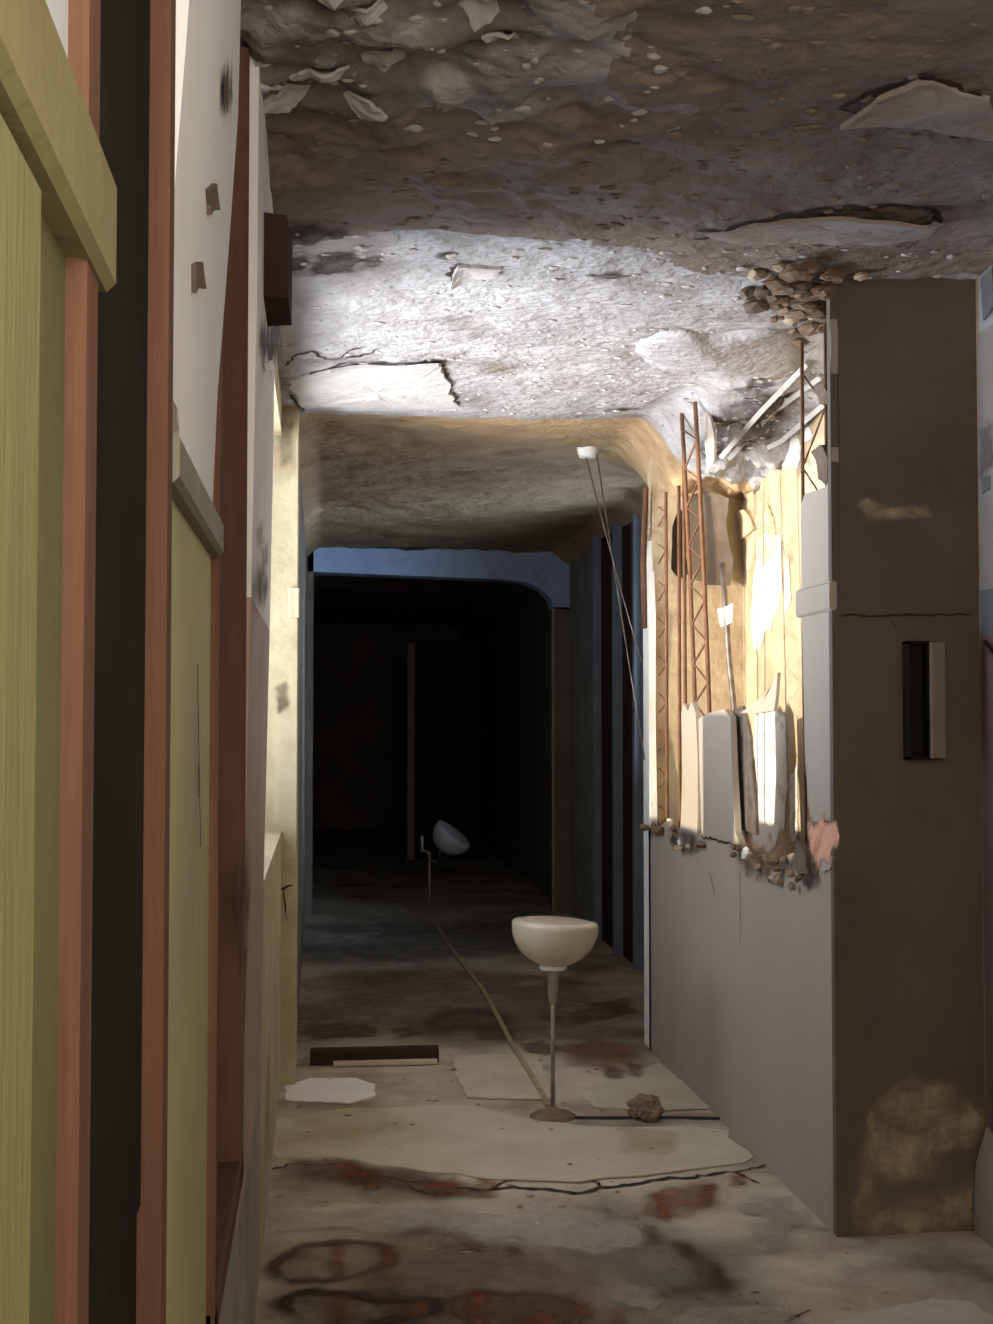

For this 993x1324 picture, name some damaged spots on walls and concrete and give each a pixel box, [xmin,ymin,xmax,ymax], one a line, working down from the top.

spalling [704,216,944,346]
crack [285,347,460,410]
spalling [701,378,785,456]
peeling [782,427,813,470]
peeling [751,531,791,650]
spalling [651,821,697,852]
peeling [739,711,839,889]
leakage [296,1160,495,1195]
crack [272,1163,766,1196]
leakage [268,1226,613,1324]
leakage [610,1214,740,1324]